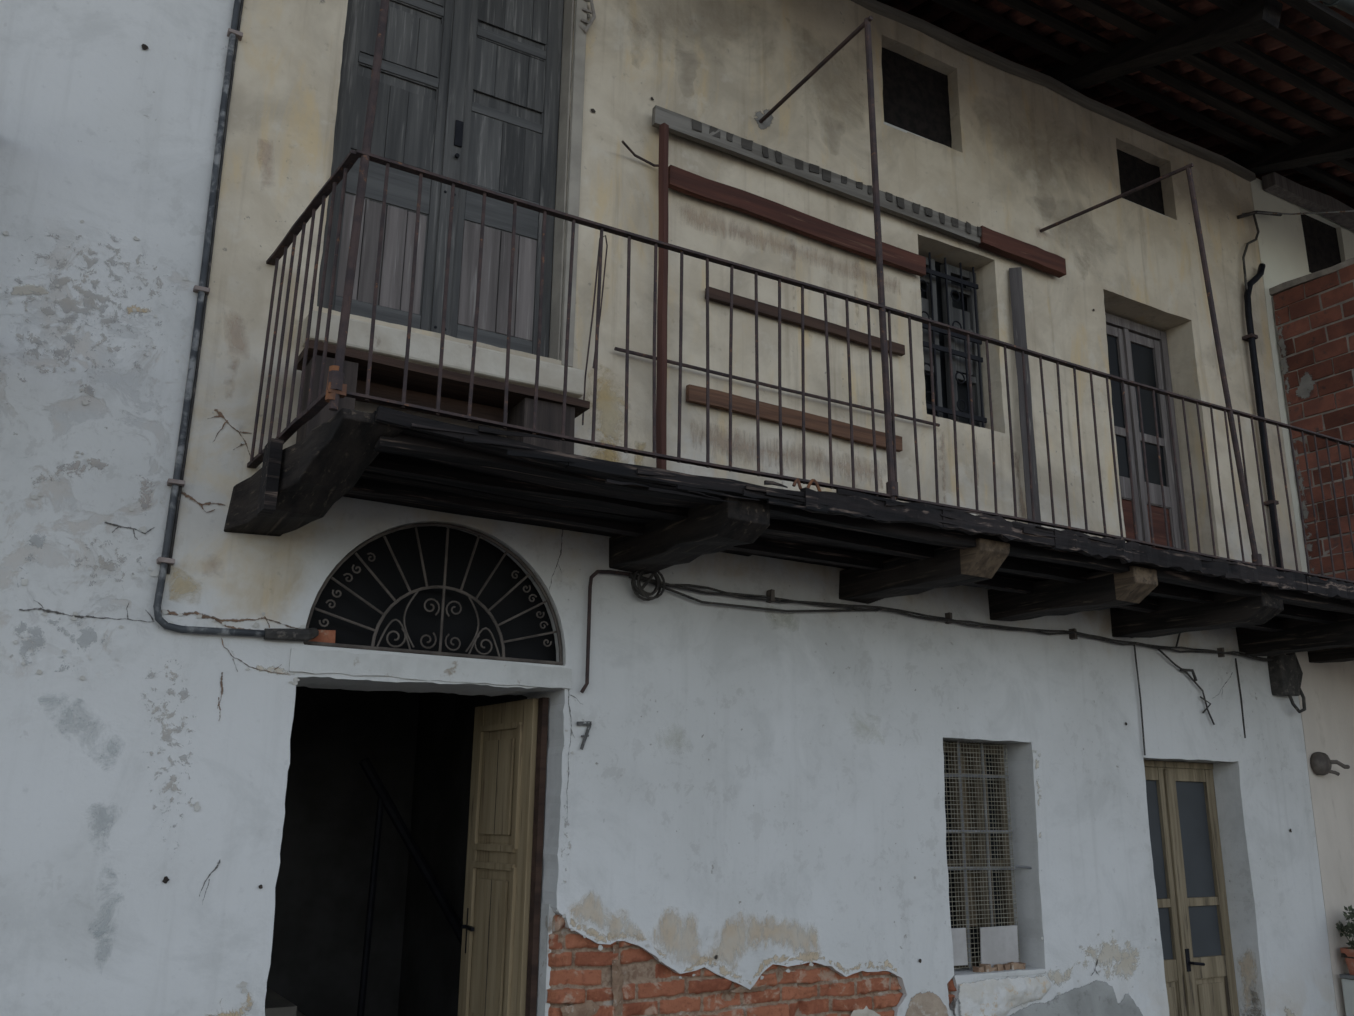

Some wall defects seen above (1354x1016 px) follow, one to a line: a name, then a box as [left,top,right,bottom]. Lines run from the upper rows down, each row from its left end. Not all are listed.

peeling [0,220,163,405]
peeling [31,451,107,500]
crack [208,409,250,455]
crack [104,519,151,540]
crack [19,600,305,720]
flaking render [546,909,957,1016]